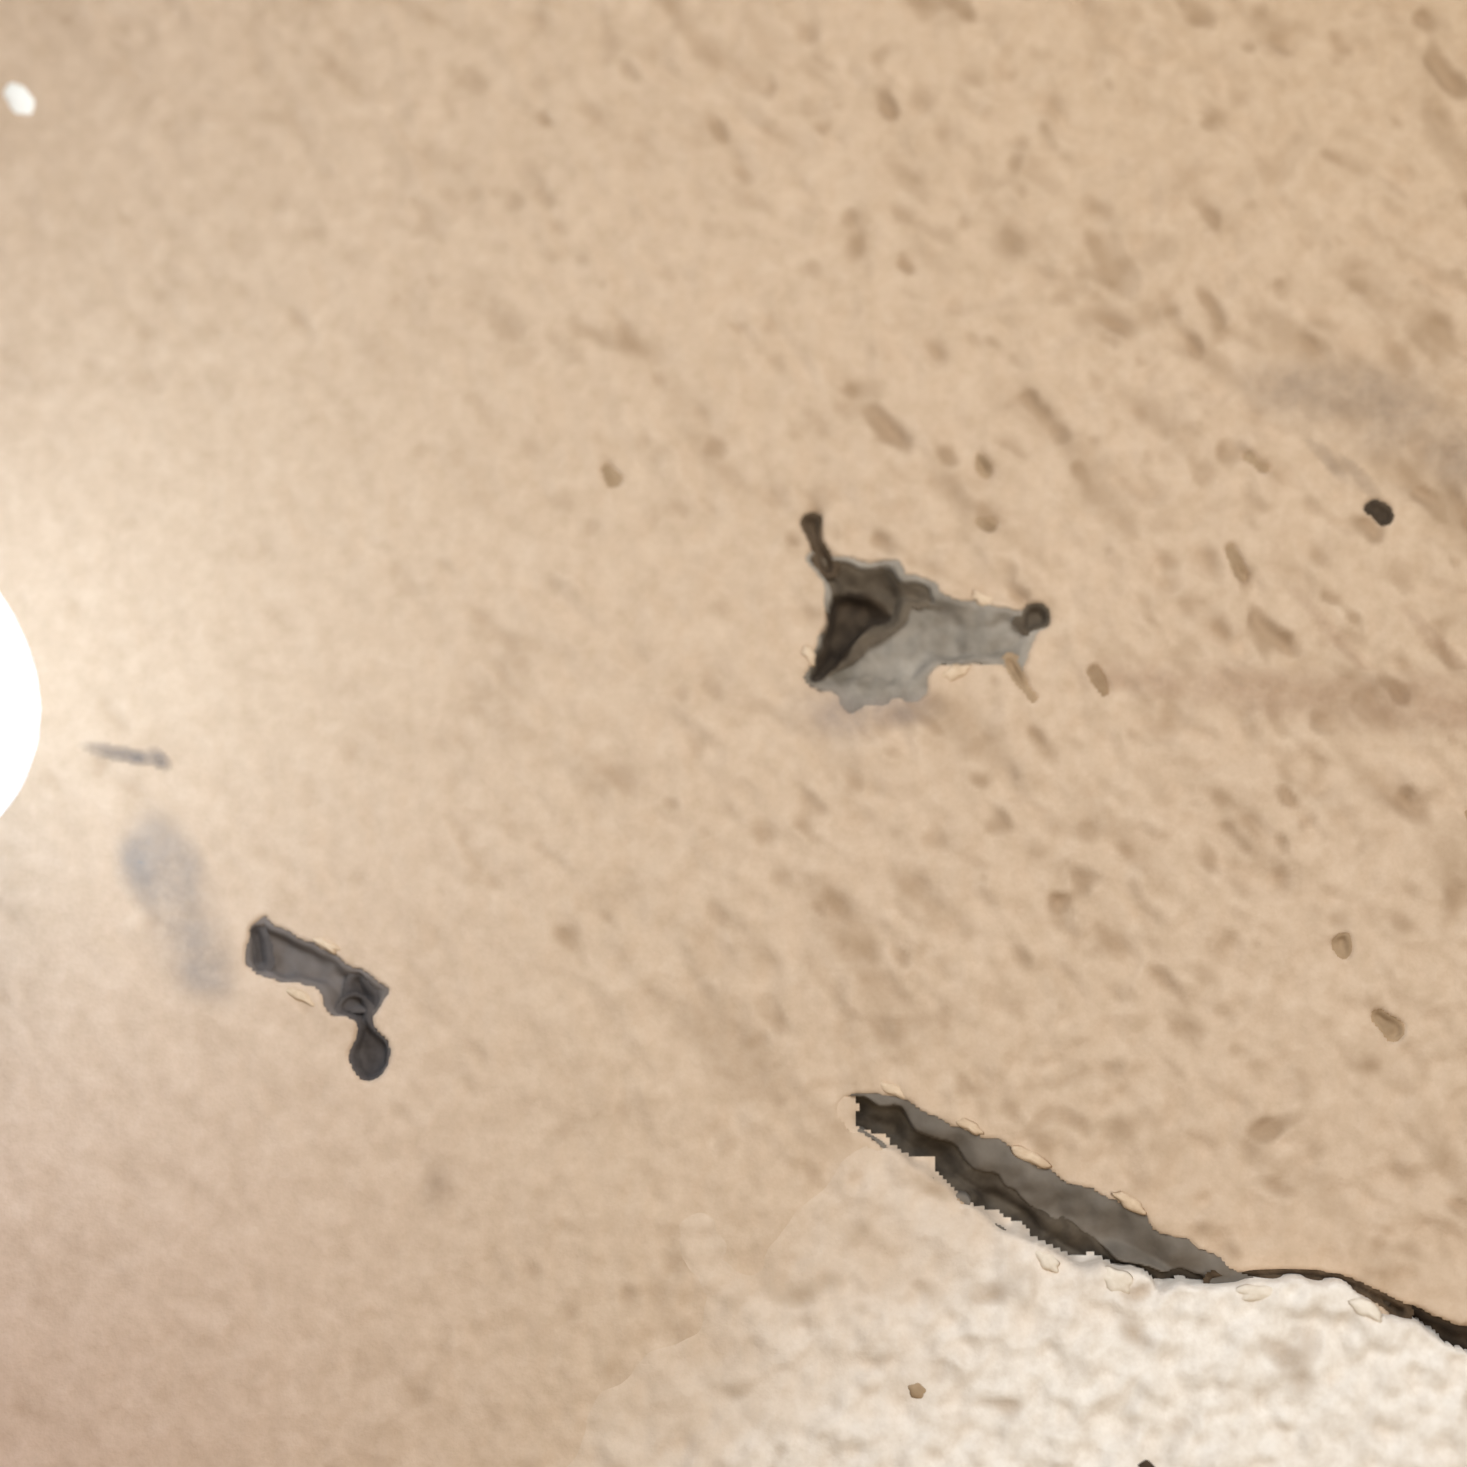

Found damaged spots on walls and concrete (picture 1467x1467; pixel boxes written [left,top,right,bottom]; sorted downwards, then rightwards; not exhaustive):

flaking render [800,512,1050,713]
flaking render [245,916,391,1081]
crack [850,1082,1467,1351]